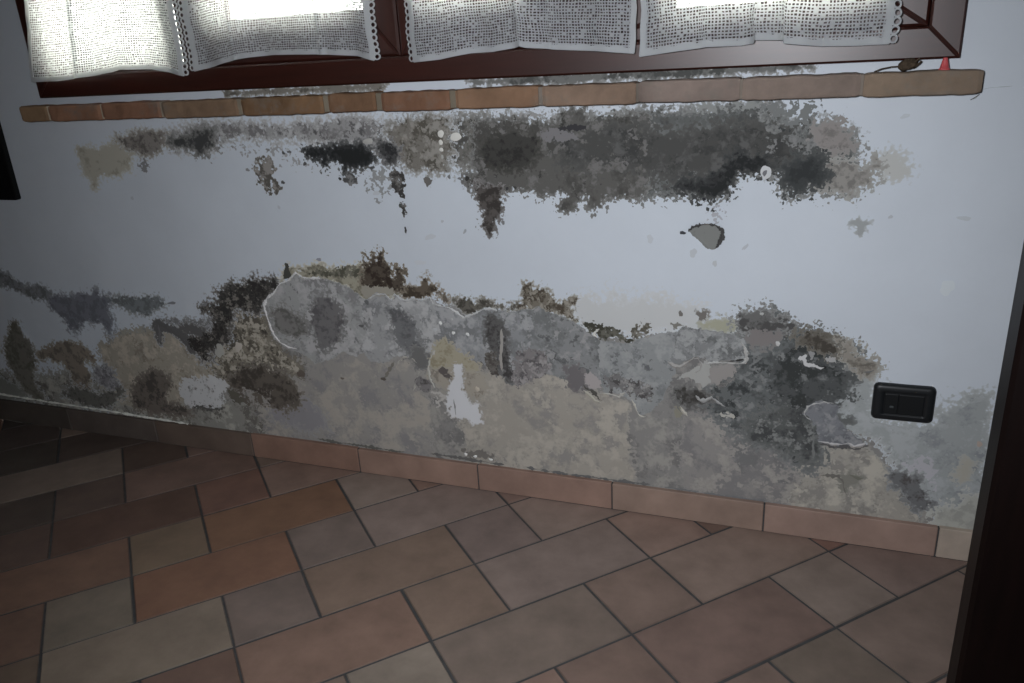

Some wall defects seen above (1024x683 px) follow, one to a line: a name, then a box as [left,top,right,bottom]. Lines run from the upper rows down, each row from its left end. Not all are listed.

water stain [71,99,924,239]
spalling [689,224,721,250]
flaking render [0,274,935,524]
water stain [0,245,997,530]